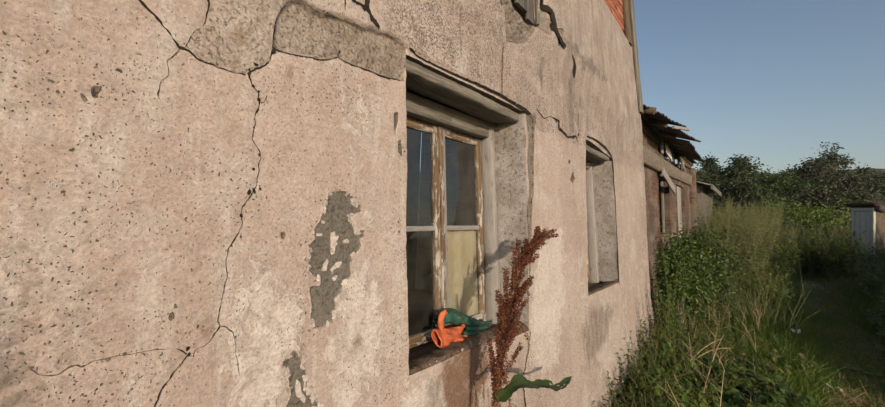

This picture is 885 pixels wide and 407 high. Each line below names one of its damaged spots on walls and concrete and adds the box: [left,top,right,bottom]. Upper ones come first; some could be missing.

spalling [187,0,406,81]
spalling [500,0,553,43]
crack [28,0,400,407]
peeling [303,189,366,330]
crack [409,43,619,271]
peeling [279,345,324,407]